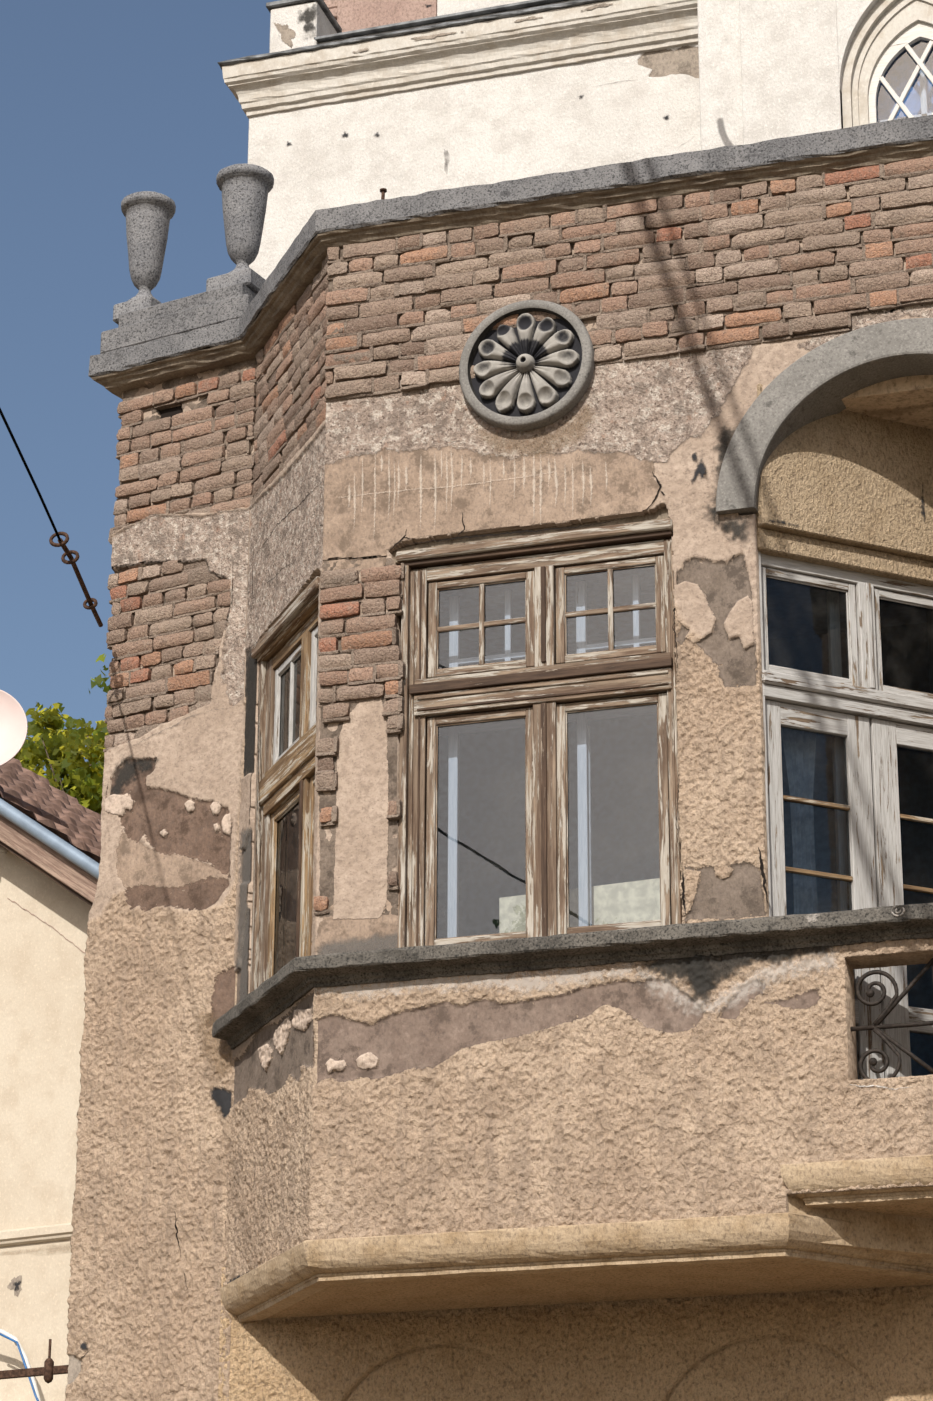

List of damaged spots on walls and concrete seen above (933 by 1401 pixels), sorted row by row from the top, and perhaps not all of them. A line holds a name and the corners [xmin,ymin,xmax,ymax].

peeling [274,23,296,48]
peeling [638,46,699,78]
flaking render [103,144,933,1028]
peeling [211,978,821,1117]